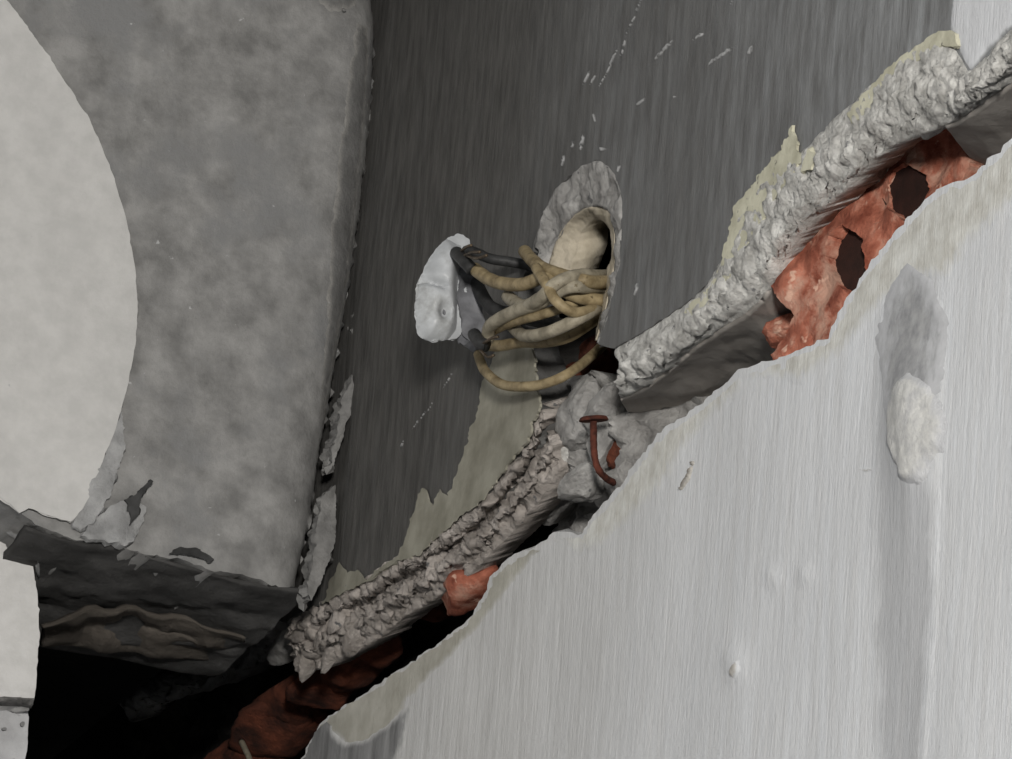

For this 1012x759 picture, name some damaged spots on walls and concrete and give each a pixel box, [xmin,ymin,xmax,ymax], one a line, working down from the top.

spalling [3,412,299,677]
spalling [204,30,1012,759]